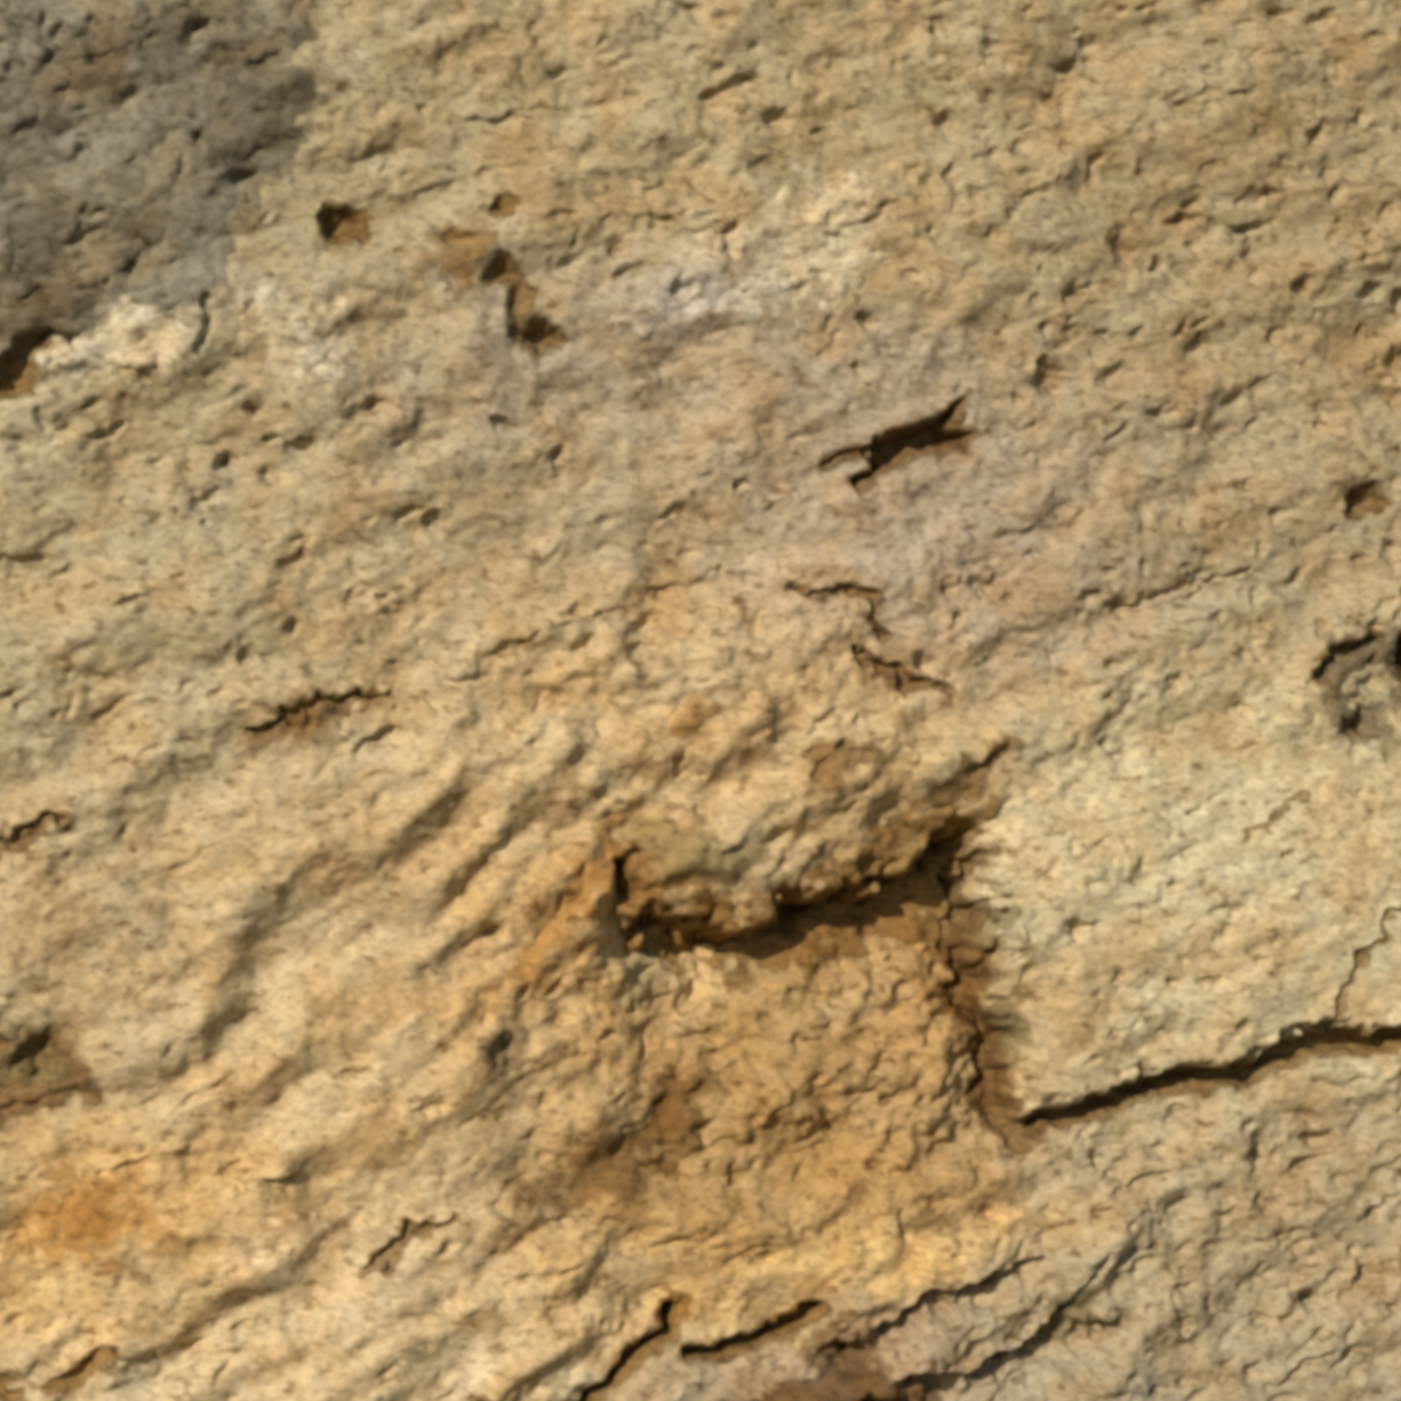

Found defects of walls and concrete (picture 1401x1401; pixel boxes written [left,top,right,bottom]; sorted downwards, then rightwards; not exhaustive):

damp [0,0,364,388]
spalling [947,858,981,908]
crack [1242,791,1309,843]
spalling [964,914,1031,1052]
crack [911,853,1401,1154]
spalling [474,886,1017,1279]
crack [468,1393,489,1401]
crack [579,1291,831,1401]